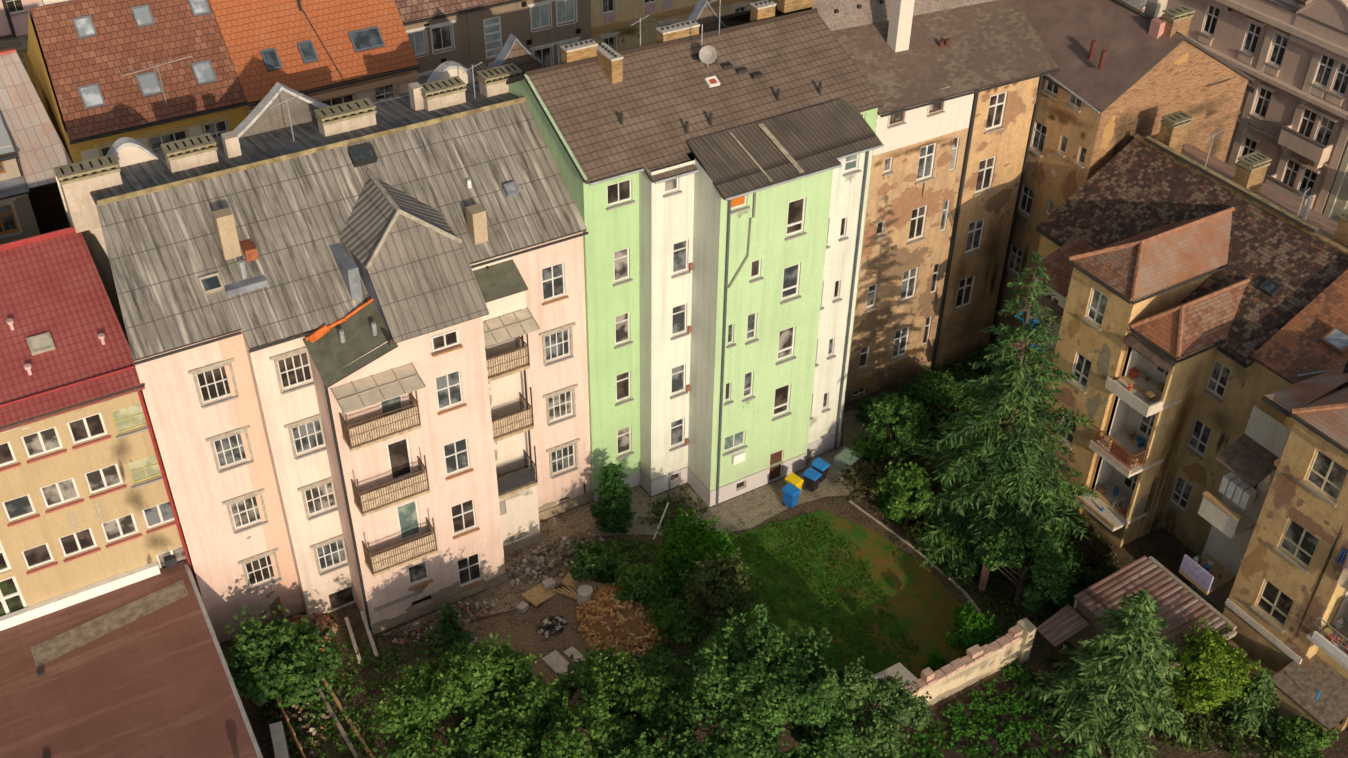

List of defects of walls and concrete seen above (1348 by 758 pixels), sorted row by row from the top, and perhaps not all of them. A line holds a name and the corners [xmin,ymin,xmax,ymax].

peeling [851,87,1078,351]
spalling [1097,102,1123,172]